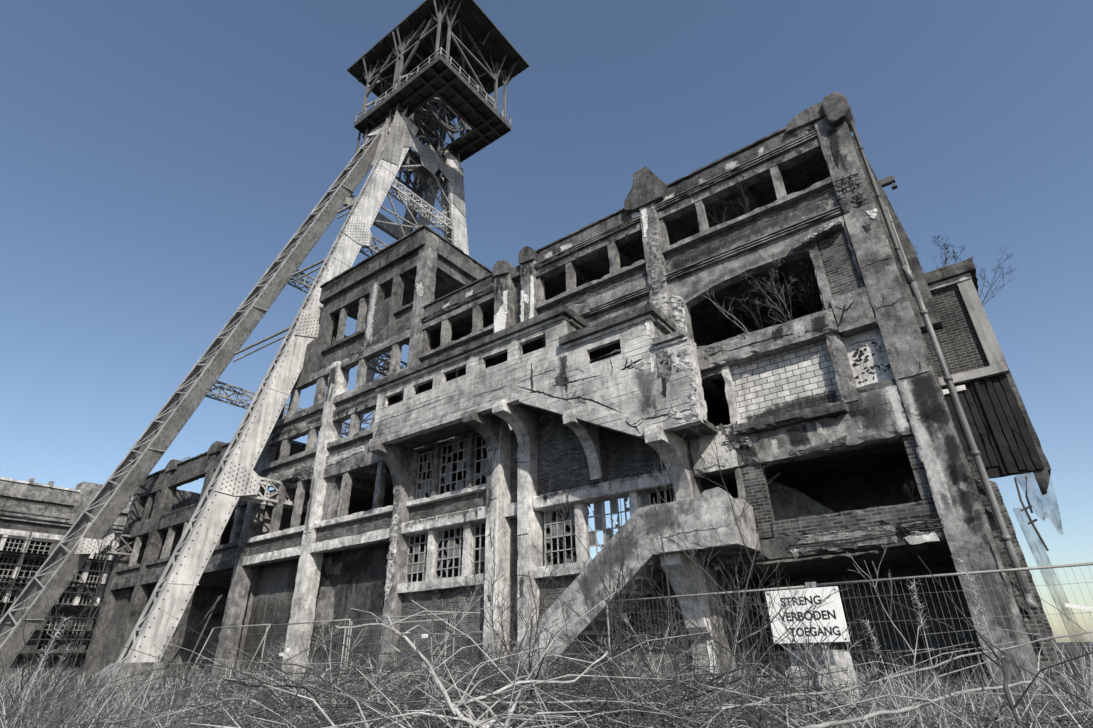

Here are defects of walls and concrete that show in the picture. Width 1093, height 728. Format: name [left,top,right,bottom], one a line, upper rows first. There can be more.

peeling [494,274,534,333]
peeling [852,341,890,383]
crack [378,356,691,437]
peeling [698,421,752,468]
water stain [748,373,989,542]